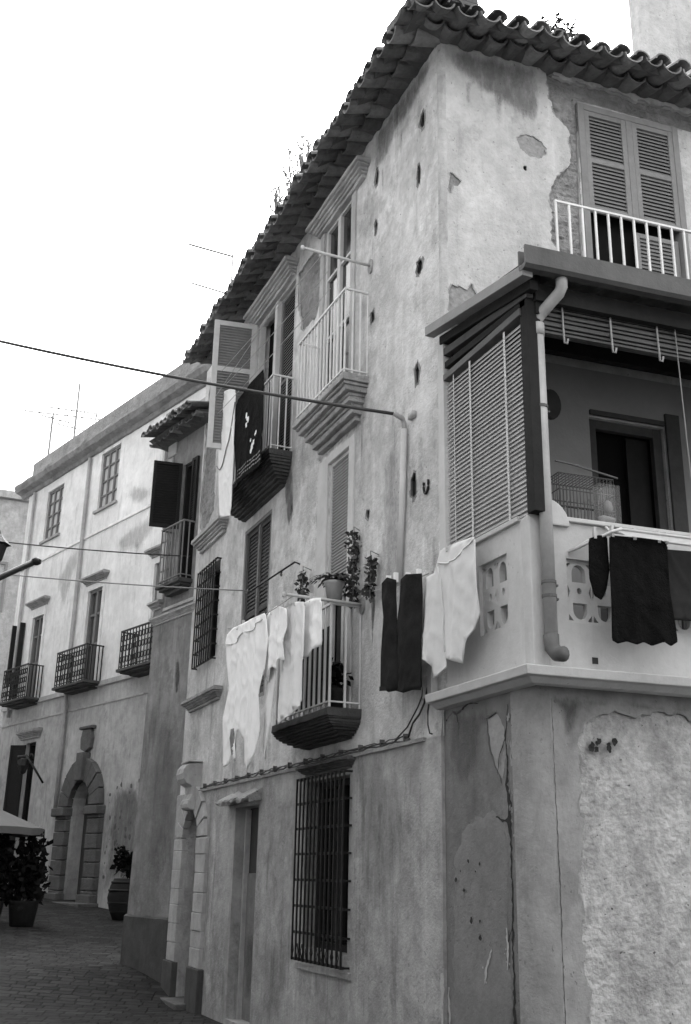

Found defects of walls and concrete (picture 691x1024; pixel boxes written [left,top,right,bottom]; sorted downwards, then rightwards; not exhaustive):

flaking render [447,172,462,193]
flaking render [516,133,547,171]
flaking render [545,73,691,256]
flaking render [447,283,477,311]
flaking render [486,710,506,785]
peeling [439,810,513,1024]
crack [496,704,517,1024]
flaking render [577,709,691,1024]